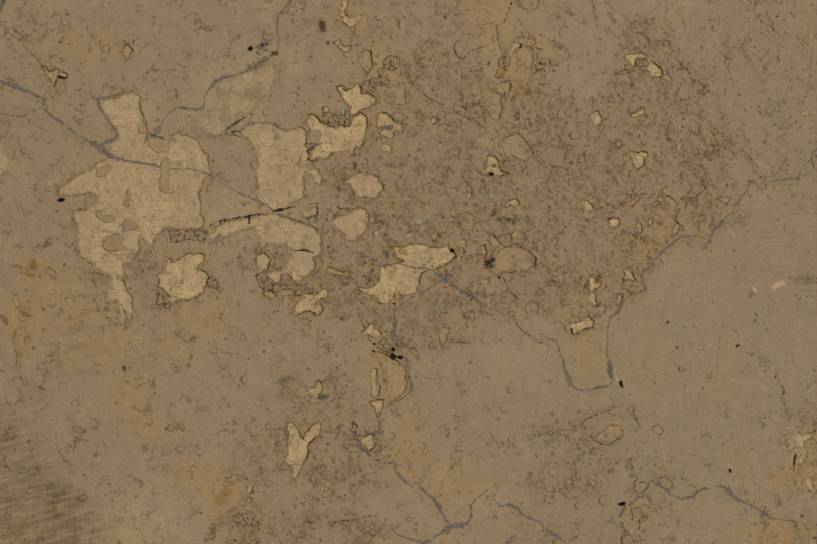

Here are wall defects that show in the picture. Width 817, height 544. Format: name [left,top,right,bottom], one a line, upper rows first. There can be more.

crack [0,0,328,234]
peeling [59,63,407,320]
peeling [286,420,321,477]
peeling [370,352,407,417]
peeling [360,239,467,304]
crack [330,251,566,544]
crack [539,148,817,391]
crack [619,479,804,544]